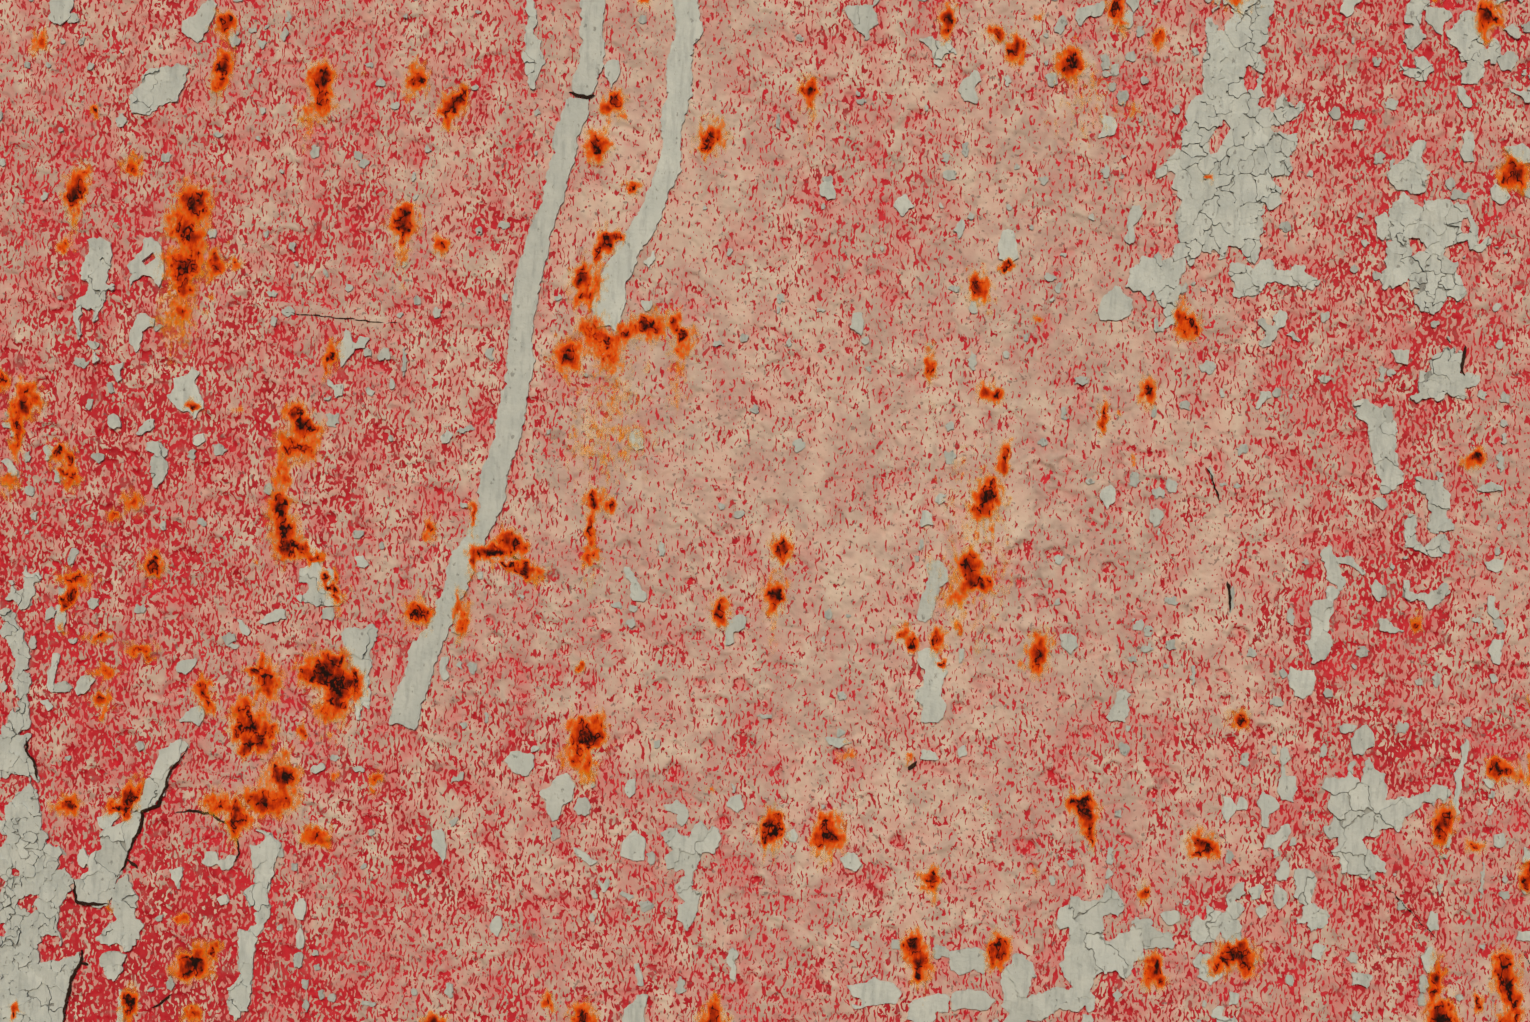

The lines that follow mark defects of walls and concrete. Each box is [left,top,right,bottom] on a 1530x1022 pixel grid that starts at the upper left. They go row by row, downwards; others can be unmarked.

peeling [591,0,704,332]
peeling [1098,0,1320,332]
peeling [389,0,621,730]
corrosion [552,229,695,468]
peeling [0,565,205,1022]
corrosion [191,649,364,842]
peeling [222,562,379,720]
corrosion [268,402,345,610]
corrosion [465,502,545,586]
corrosion [895,439,1013,669]
peeling [1322,717,1472,880]
corrosion [1426,949,1524,1022]